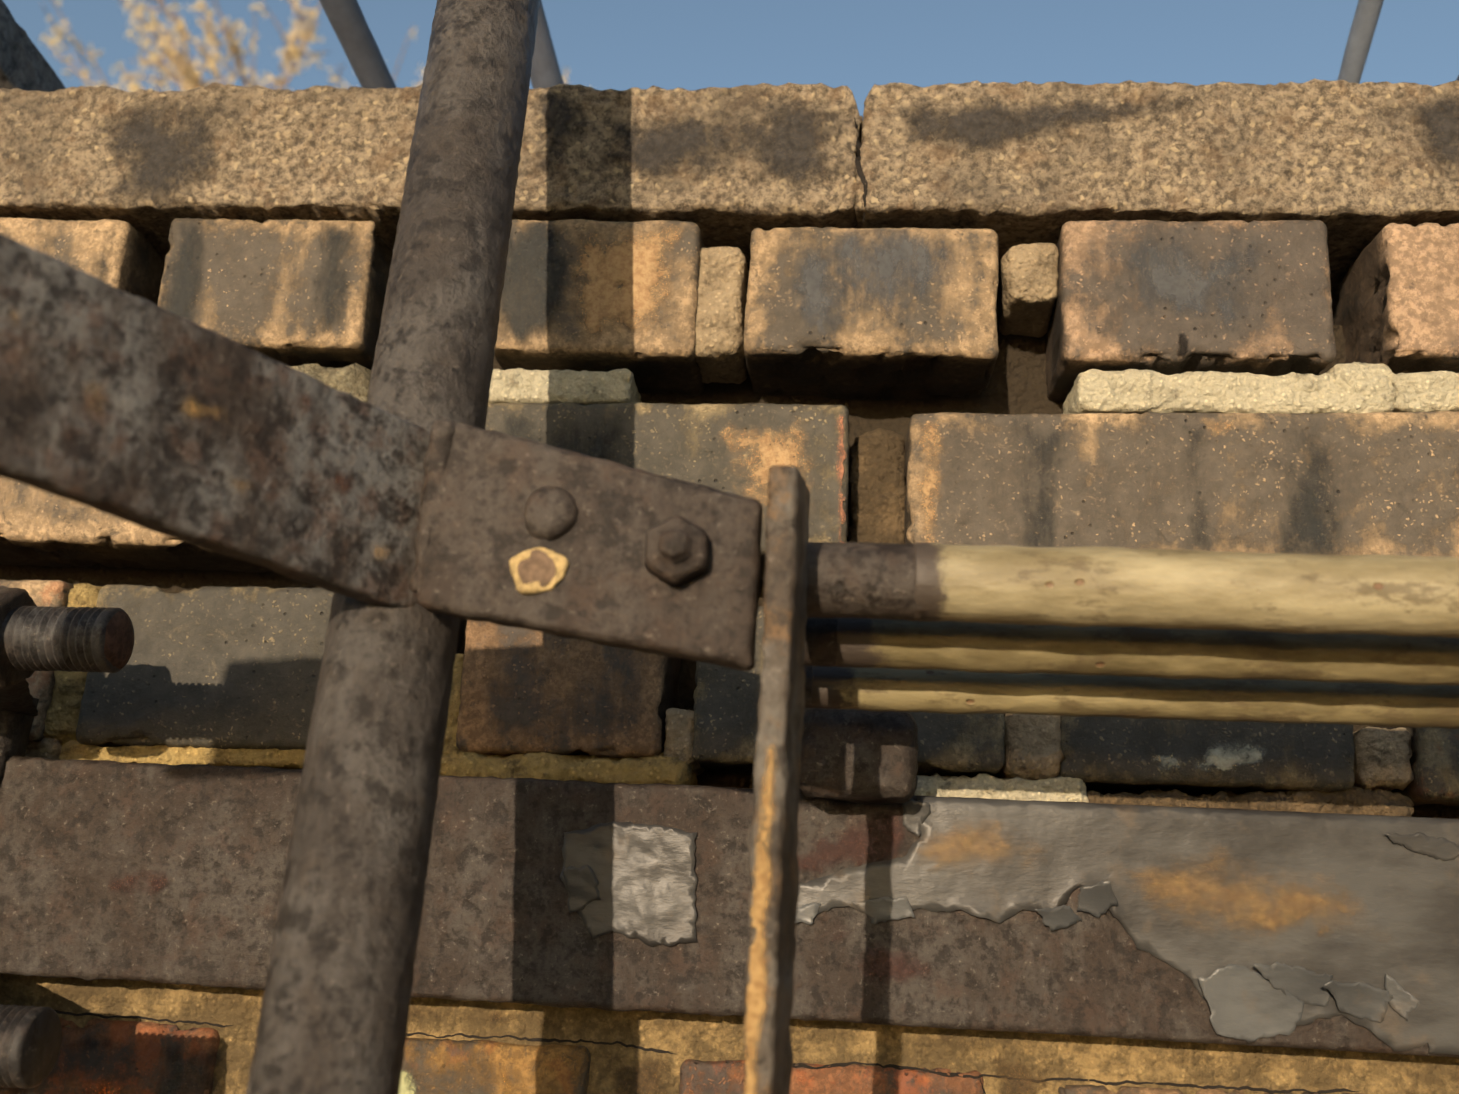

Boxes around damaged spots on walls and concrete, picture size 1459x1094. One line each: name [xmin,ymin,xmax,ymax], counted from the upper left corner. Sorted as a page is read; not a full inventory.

leakage [540,94,584,169]
leakage [609,104,828,183]
peeling [560,821,698,947]
peeling [796,796,1459,1055]
corrosion [1149,873,1344,928]